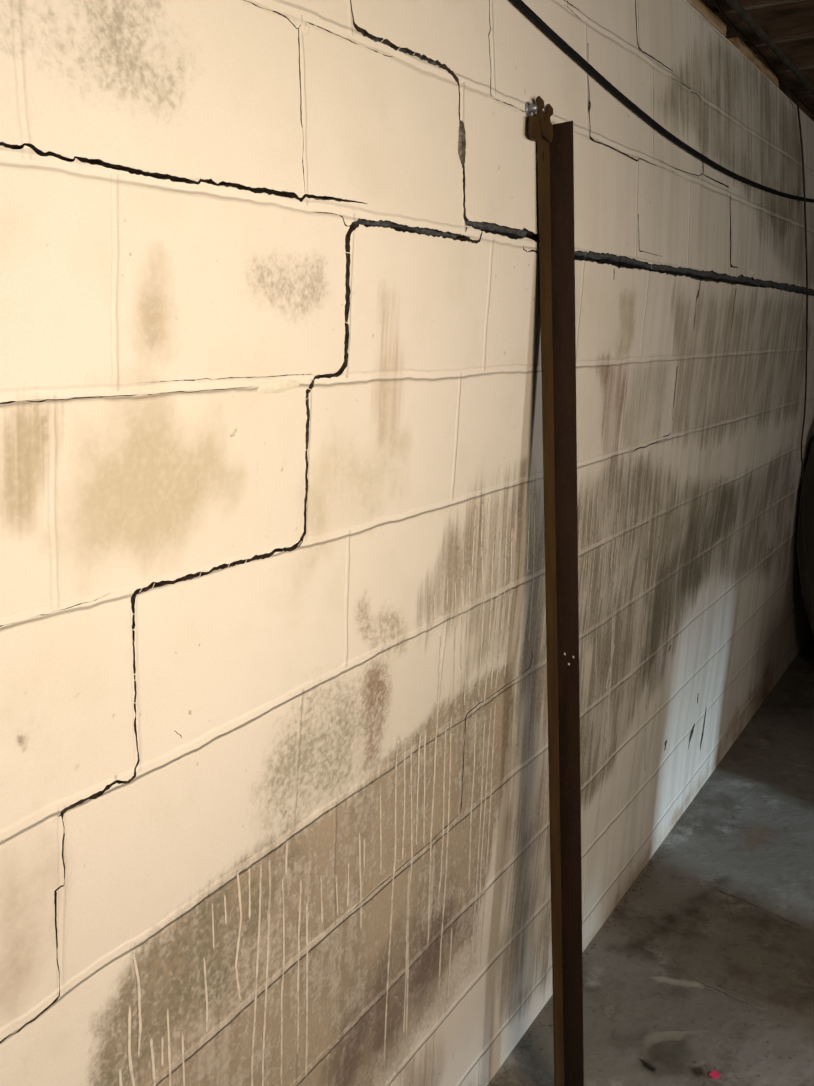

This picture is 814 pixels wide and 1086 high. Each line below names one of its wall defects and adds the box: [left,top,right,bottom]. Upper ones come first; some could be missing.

crack [635,0,701,99]
crack [575,78,814,329]
crack [0,0,539,1044]
leakage [100,484,550,1086]
leakage [578,462,732,800]
crack [633,366,678,452]